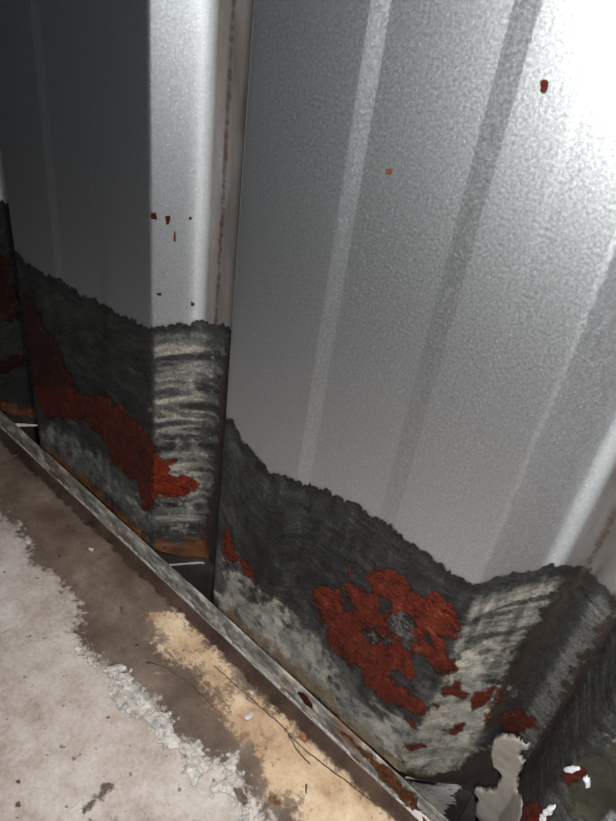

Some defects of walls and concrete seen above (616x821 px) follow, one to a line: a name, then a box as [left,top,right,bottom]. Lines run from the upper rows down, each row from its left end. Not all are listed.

corrosion [0,286,213,559]
corrosion [112,530,159,574]
water stain [0,200,616,821]
spalling [75,644,212,787]
corrosion [146,610,396,821]
corrosion [213,527,549,821]
spalling [209,748,274,821]
peeling [474,732,531,821]
peeling [539,804,556,821]
corrosion [561,766,586,786]
peeling [564,765,591,788]